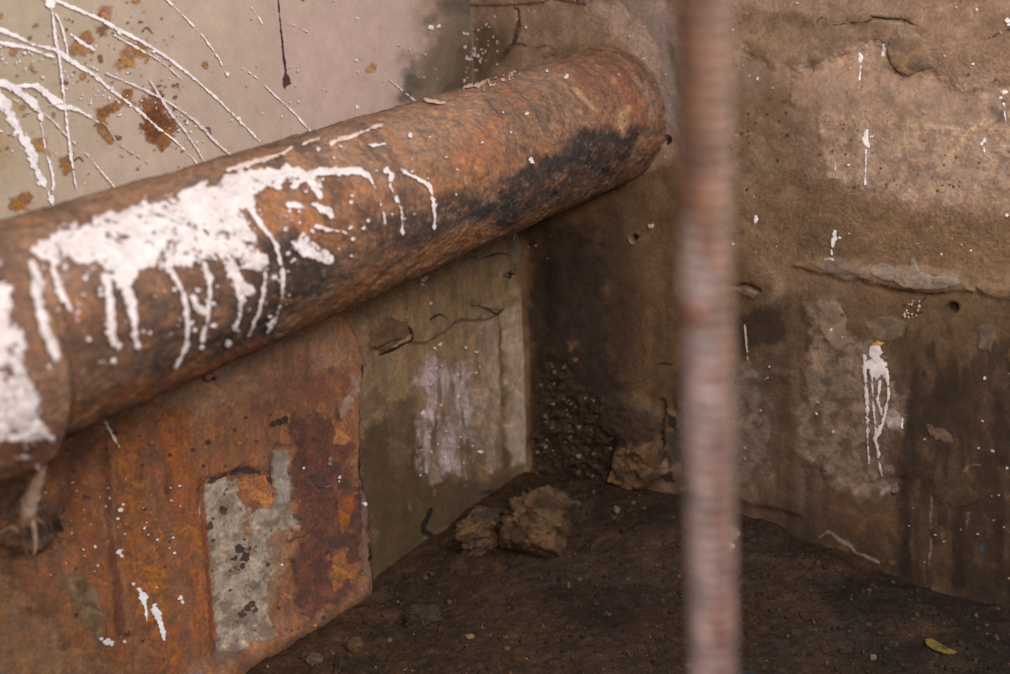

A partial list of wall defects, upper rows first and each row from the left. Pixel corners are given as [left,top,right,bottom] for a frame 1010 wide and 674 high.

corrosion [48,6,114,85]
crack [500,6,555,56]
crack [817,16,919,27]
corrosion [94,40,186,152]
corrosion [32,132,73,175]
corrosion [9,192,32,211]
spalling [269,415,288,427]
water stain [798,294,1010,609]
corrosion [0,351,371,674]
spalling [198,449,300,652]